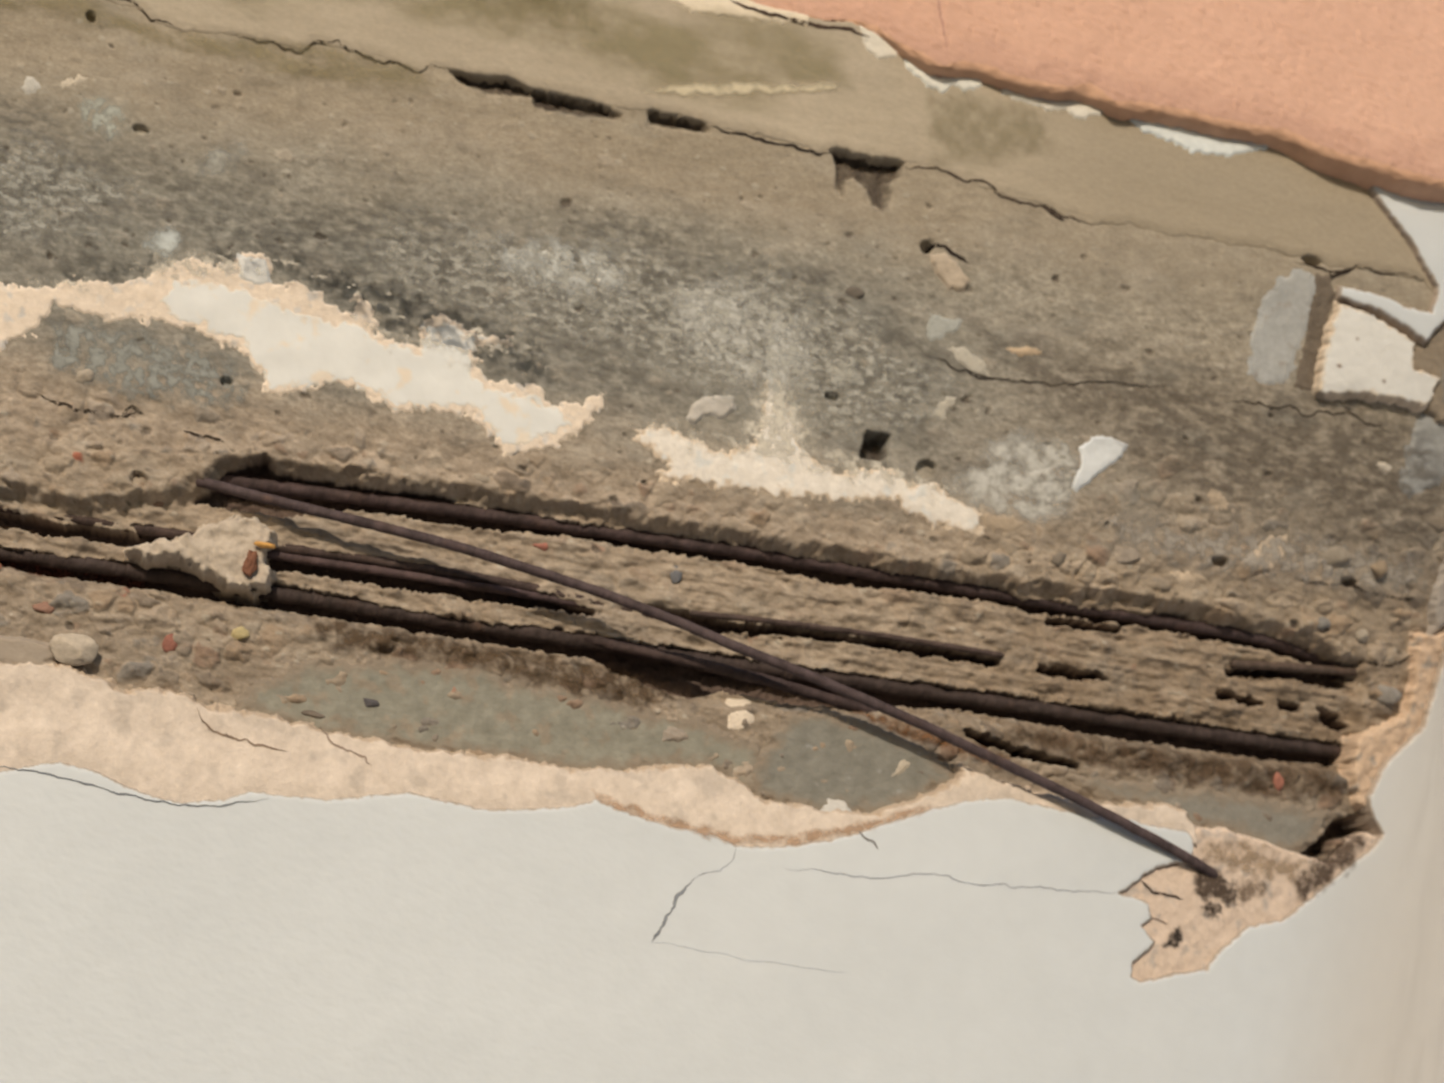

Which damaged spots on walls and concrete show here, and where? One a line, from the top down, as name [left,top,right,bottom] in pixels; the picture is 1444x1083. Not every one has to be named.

crack [231,35,444,74]
crack [711,126,830,156]
hole [833,156,897,208]
crack [898,166,1093,226]
spalling [930,252,971,293]
damp [352,224,948,489]
spalling [926,312,989,377]
rust [1,562,145,589]
rust [242,541,276,577]
rust [315,622,673,701]
spalling [0,322,1444,981]
rust [1018,729,1336,796]